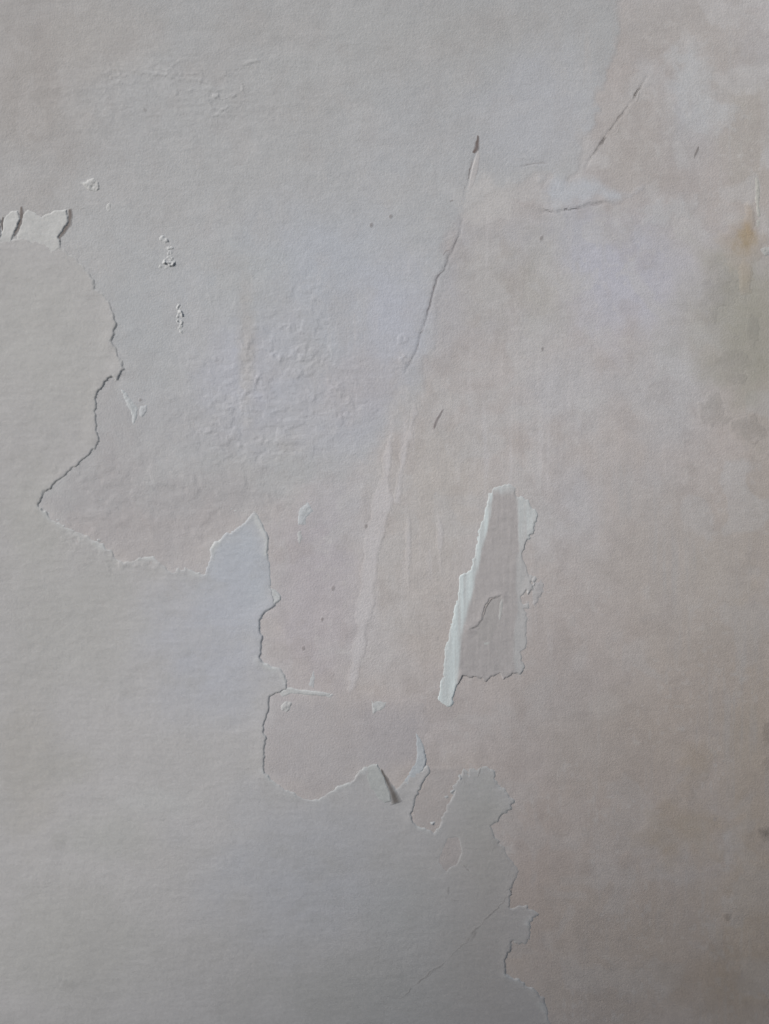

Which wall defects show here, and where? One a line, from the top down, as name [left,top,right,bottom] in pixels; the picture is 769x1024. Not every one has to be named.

crack [589,79,646,162]
crack [407,135,480,367]
peeling [412,764,463,833]